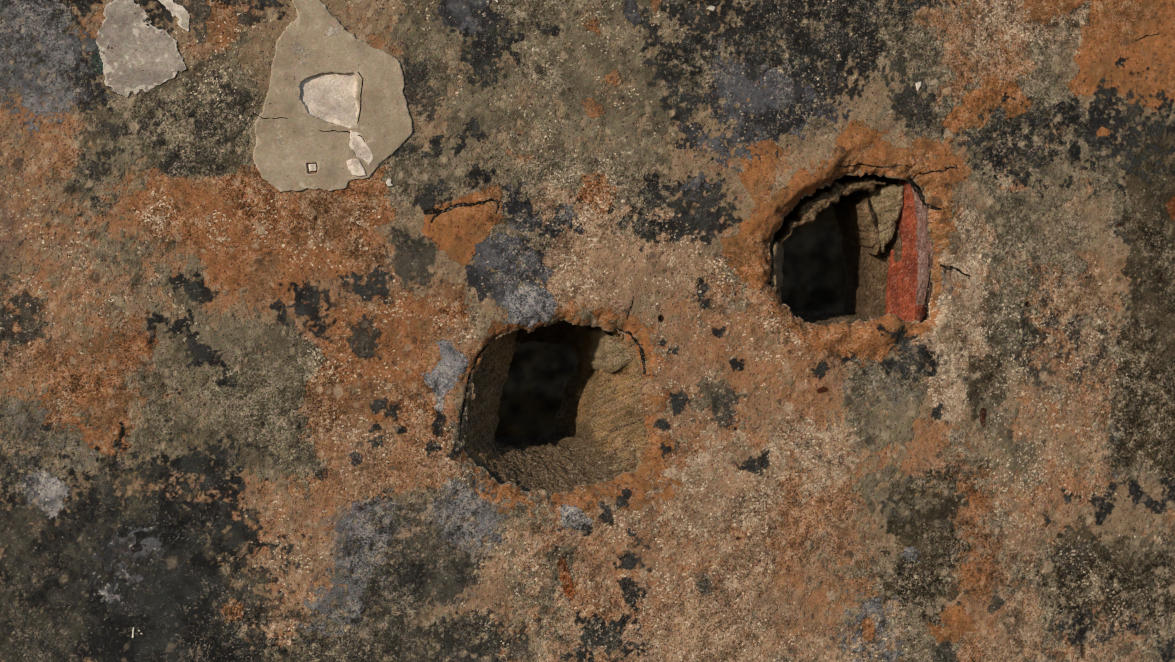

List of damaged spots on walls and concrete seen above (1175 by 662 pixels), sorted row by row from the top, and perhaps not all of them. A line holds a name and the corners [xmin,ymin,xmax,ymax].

peeling [96,0,190,98]
peeling [205,0,243,50]
leakage [536,20,563,36]
leakage [603,0,1175,255]
peeling [122,72,472,436]
peeling [422,184,505,266]
spalling [721,0,1175,425]
leakage [349,398,406,466]
spalling [461,299,866,553]
leakage [0,409,513,662]
leakage [1061,473,1175,525]